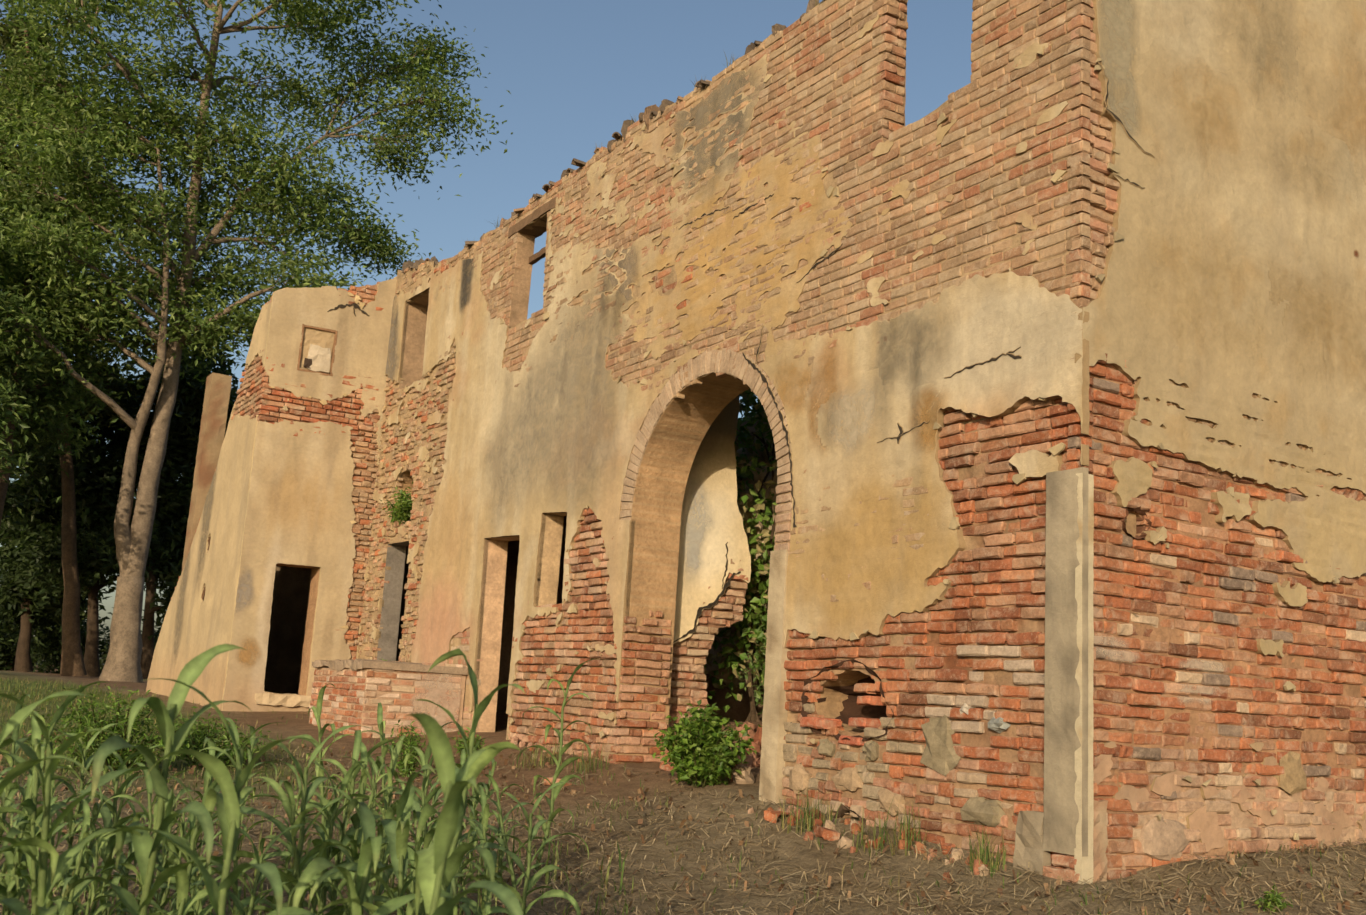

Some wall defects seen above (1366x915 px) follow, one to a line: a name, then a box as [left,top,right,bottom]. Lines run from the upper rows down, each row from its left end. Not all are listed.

flaking render [231,332,463,662]
flaking render [337,282,384,311]
flaking render [507,505,748,764]
flaking render [396,0,1125,400]
crack [877,421,929,444]
crack [944,346,1022,378]
flaking render [775,353,1366,880]